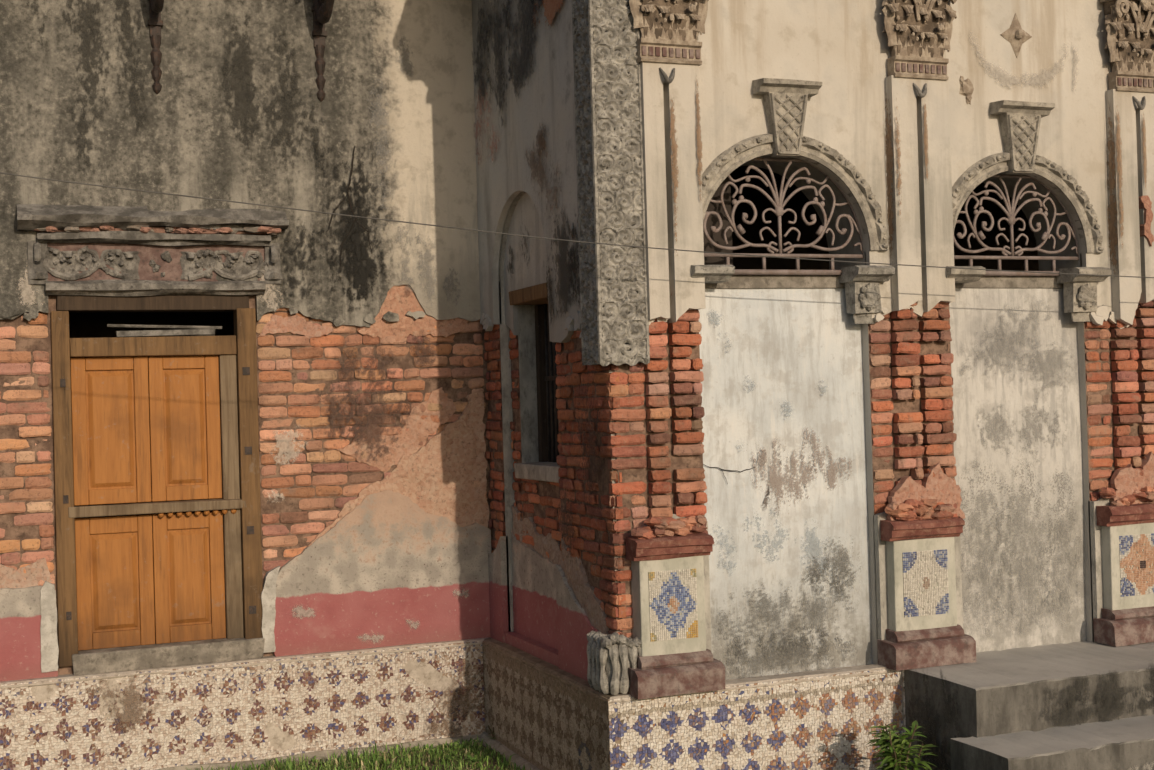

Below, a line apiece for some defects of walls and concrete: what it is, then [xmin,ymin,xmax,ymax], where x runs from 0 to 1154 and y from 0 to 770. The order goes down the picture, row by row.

water stain [19,270,35,305]
water stain [62,0,147,174]
water stain [222,18,392,311]
water stain [472,0,542,163]
rust [1107,108,1124,273]
flaking render [0,301,55,588]
flaking render [256,285,708,638]
flaking render [869,297,965,521]
flaking render [1083,300,1154,506]
water stain [719,540,860,678]